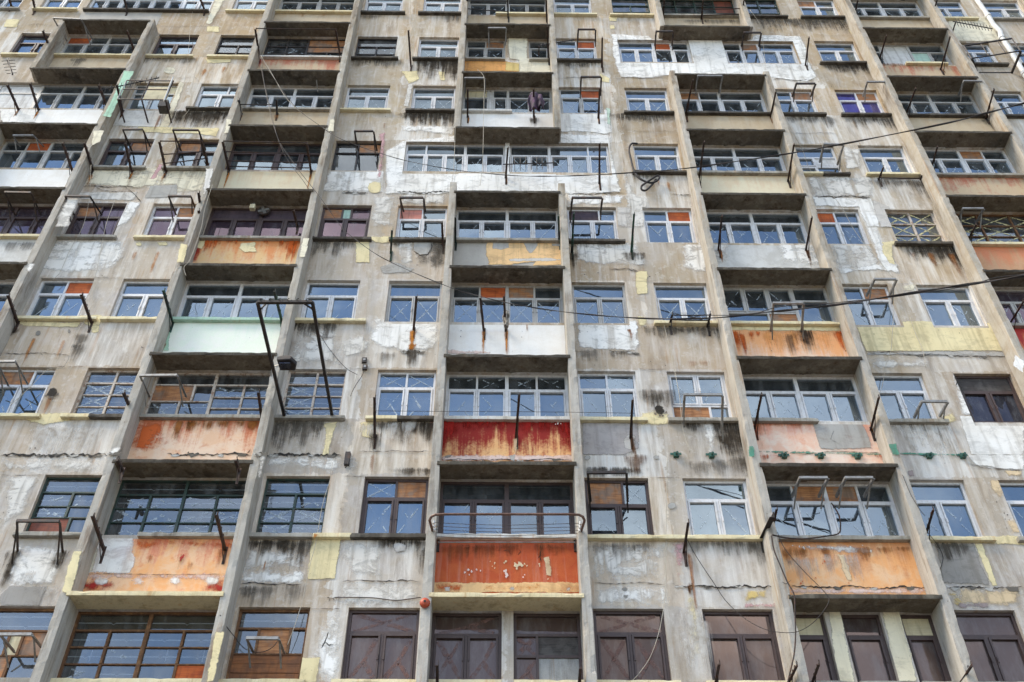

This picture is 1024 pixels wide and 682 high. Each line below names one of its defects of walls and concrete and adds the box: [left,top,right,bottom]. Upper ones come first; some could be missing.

peeling [324,110,648,227]
rust [267,241,298,260]
rust [733,331,759,352]
rust [173,421,258,435]
water stain [272,421,324,448]
rust [443,421,505,445]
rust [514,422,571,453]
water stain [713,423,742,454]
peeling [958,387,1024,502]
water stain [587,455,646,472]
peeling [434,557,579,593]